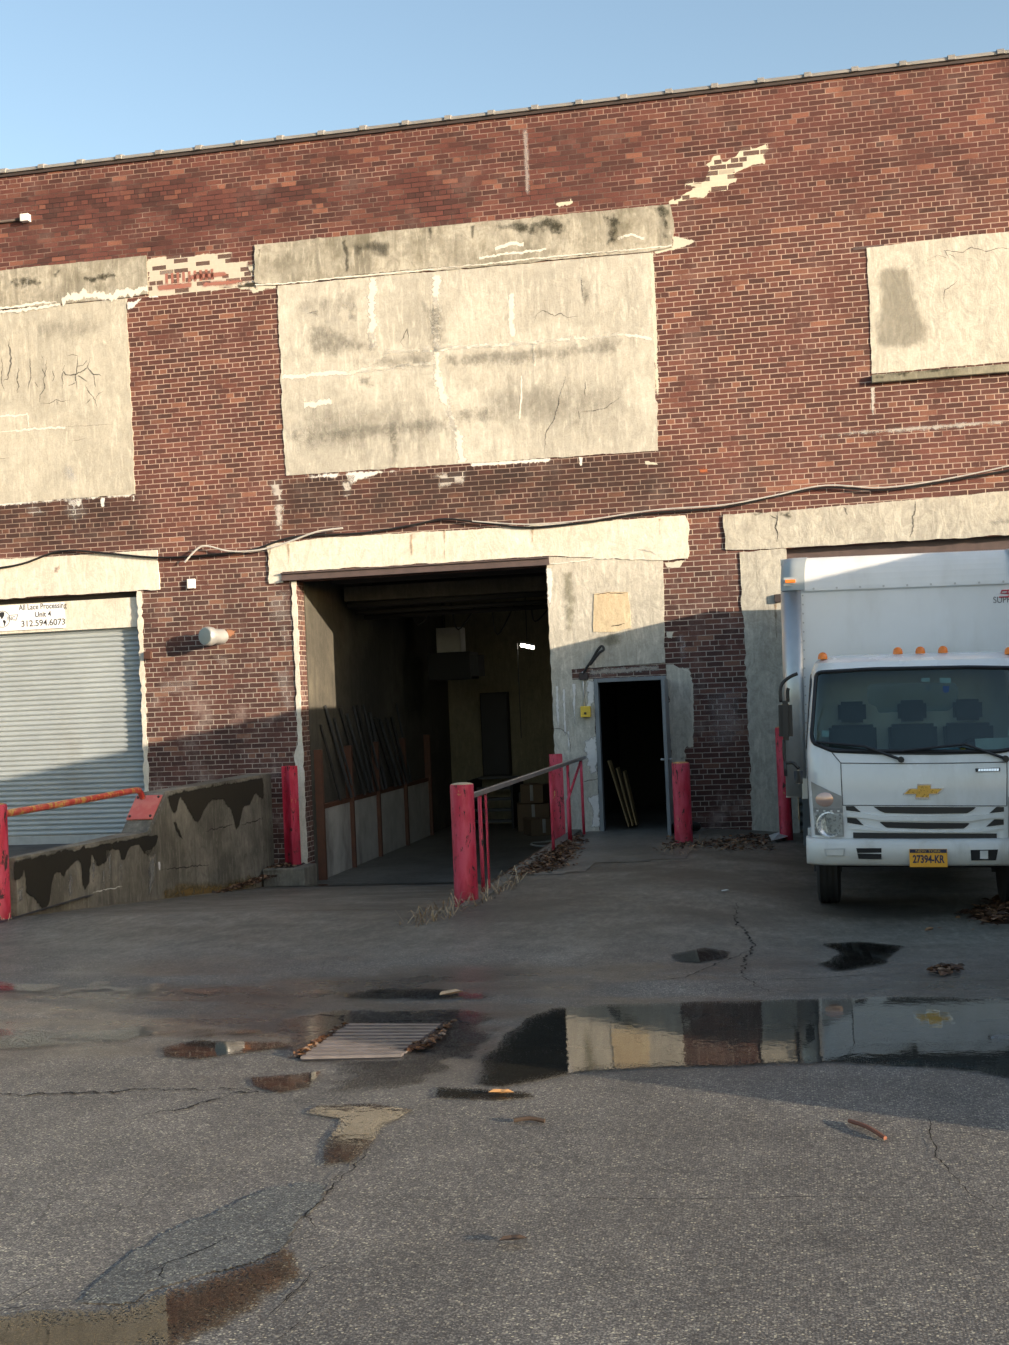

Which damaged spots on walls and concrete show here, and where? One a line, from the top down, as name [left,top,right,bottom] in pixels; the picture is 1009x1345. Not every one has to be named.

peeling [669,143,768,204]
peeling [127,252,276,309]
leakage [168,778,264,838]
leakage [14,835,256,908]